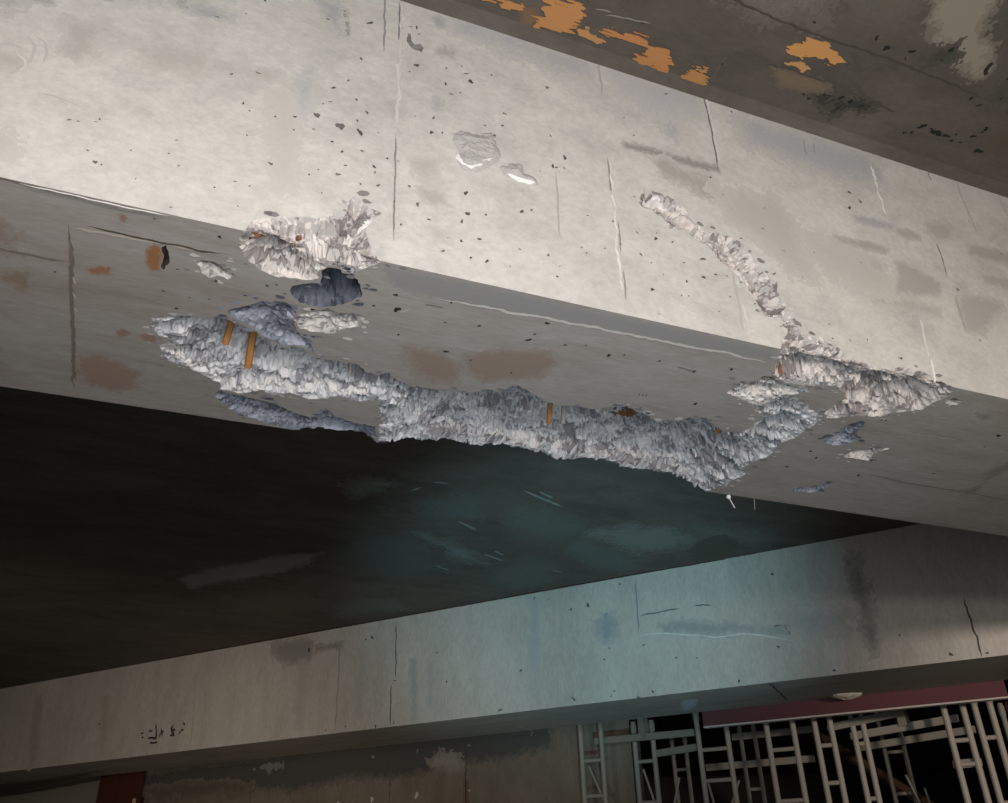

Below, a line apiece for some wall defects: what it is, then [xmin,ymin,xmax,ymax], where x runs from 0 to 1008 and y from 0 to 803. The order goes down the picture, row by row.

spalling [407,33,423,52]
peeling [482,0,674,73]
peeling [681,65,710,85]
damp [710,0,932,43]
damp [910,36,968,83]
damp [974,0,1008,113]
damp [397,13,945,319]
corrosion [144,244,164,272]
damp [853,214,1008,340]
spalling [143,190,962,491]
crack [964,600,982,656]